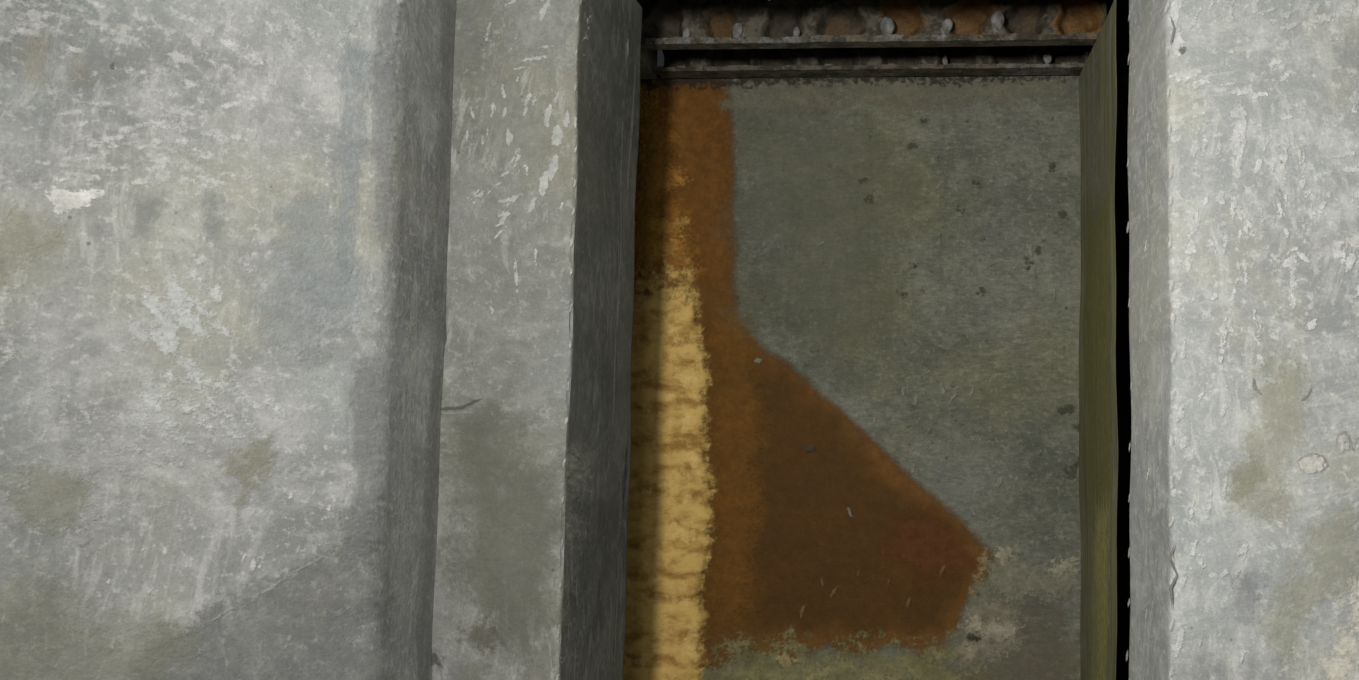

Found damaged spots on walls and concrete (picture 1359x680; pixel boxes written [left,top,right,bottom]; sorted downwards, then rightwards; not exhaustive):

corrosion [634,79,993,669]